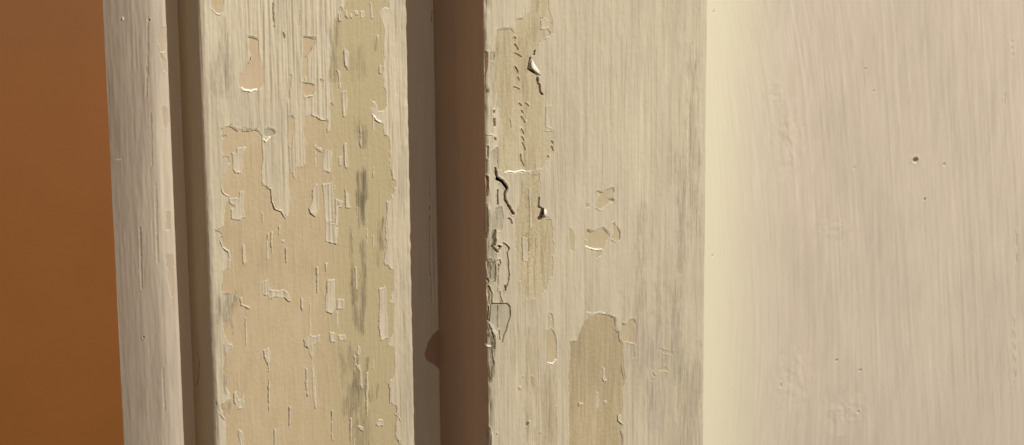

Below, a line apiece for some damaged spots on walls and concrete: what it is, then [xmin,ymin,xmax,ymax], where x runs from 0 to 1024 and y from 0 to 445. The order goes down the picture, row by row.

peeling [485,0,554,301]
peeling [214,0,401,445]
peeling [584,221,621,250]
peeling [485,259,510,347]
peeling [568,311,637,445]